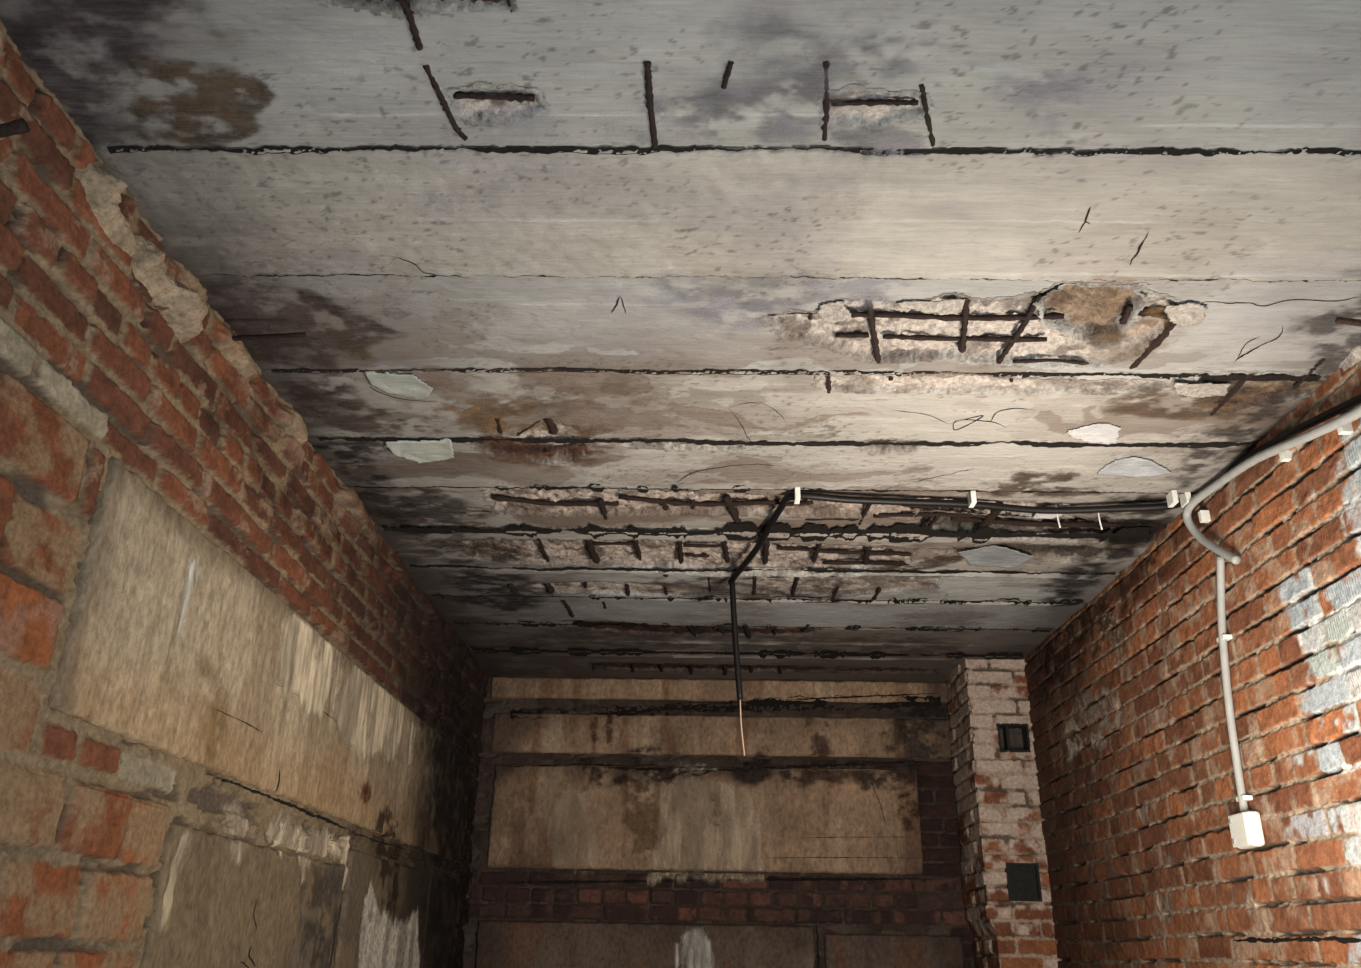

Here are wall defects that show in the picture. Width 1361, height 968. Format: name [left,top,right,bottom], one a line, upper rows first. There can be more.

damp [4,0,275,146]
crack [107,145,1361,157]
damp [211,283,416,469]
spalling [756,281,1334,416]
damp [430,382,602,437]
damp [358,475,489,538]
damp [994,473,1103,497]
spalling [455,487,1155,639]
crack [1233,936,1361,944]